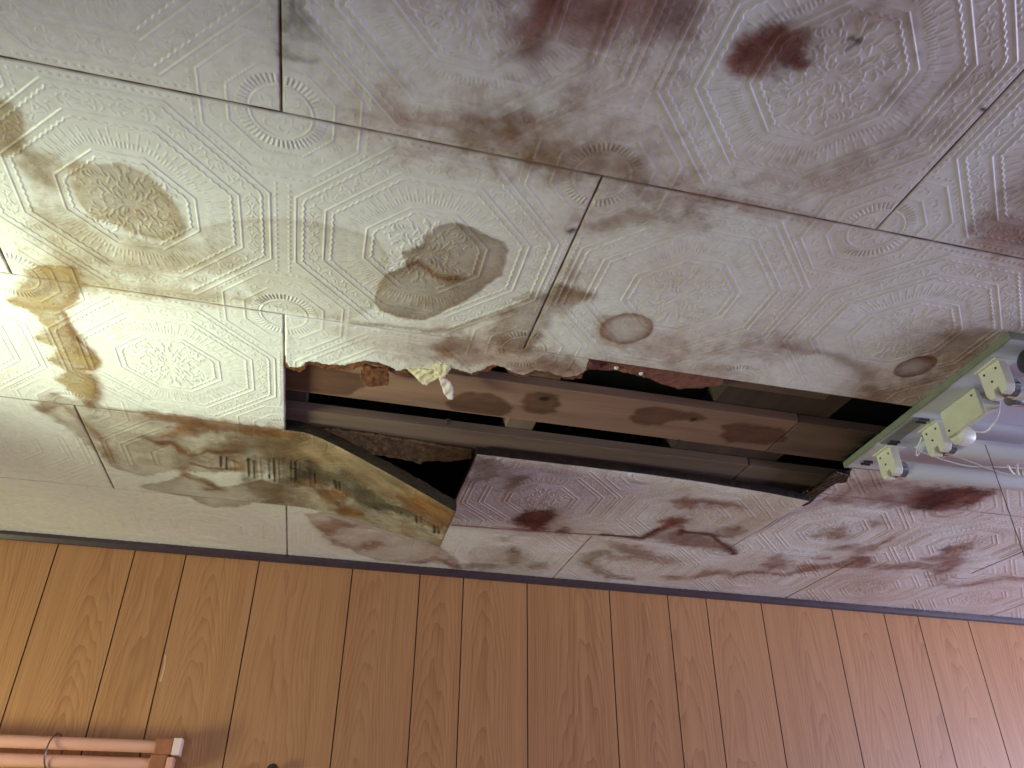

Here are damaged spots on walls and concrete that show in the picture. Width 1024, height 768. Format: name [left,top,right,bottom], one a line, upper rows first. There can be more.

rust [727,24,807,74]
damp [0,103,50,181]
damp [376,225,506,319]
damp [11,255,99,405]
damp [600,314,653,340]
peeling [360,364,389,387]
peeling [408,362,454,400]
rust [874,483,983,511]
rust [511,511,576,534]
rust [594,518,737,555]
damp [697,535,888,578]
damp [879,545,970,572]